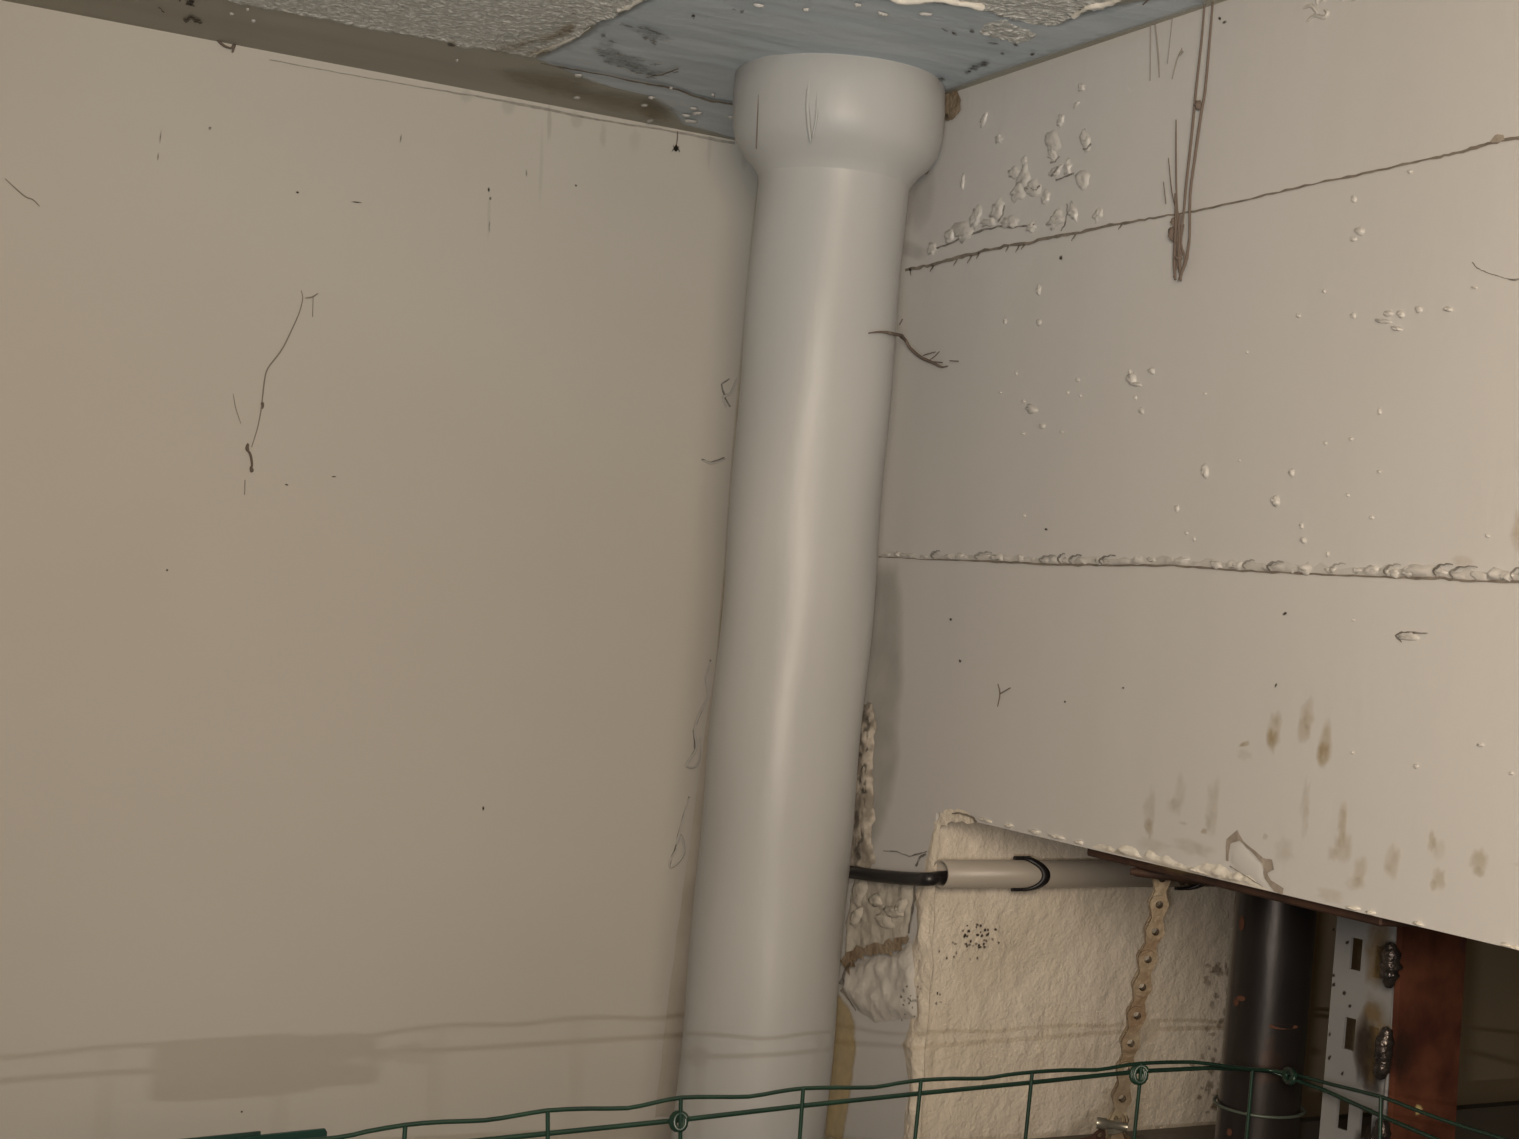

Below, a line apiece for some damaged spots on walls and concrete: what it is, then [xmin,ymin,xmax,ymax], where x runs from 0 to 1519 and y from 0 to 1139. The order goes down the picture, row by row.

spalling [945,91,961,121]
crack [905,136,1519,275]
crack [1043,553,1116,564]
crack [1242,560,1280,571]
crack [1432,563,1519,581]